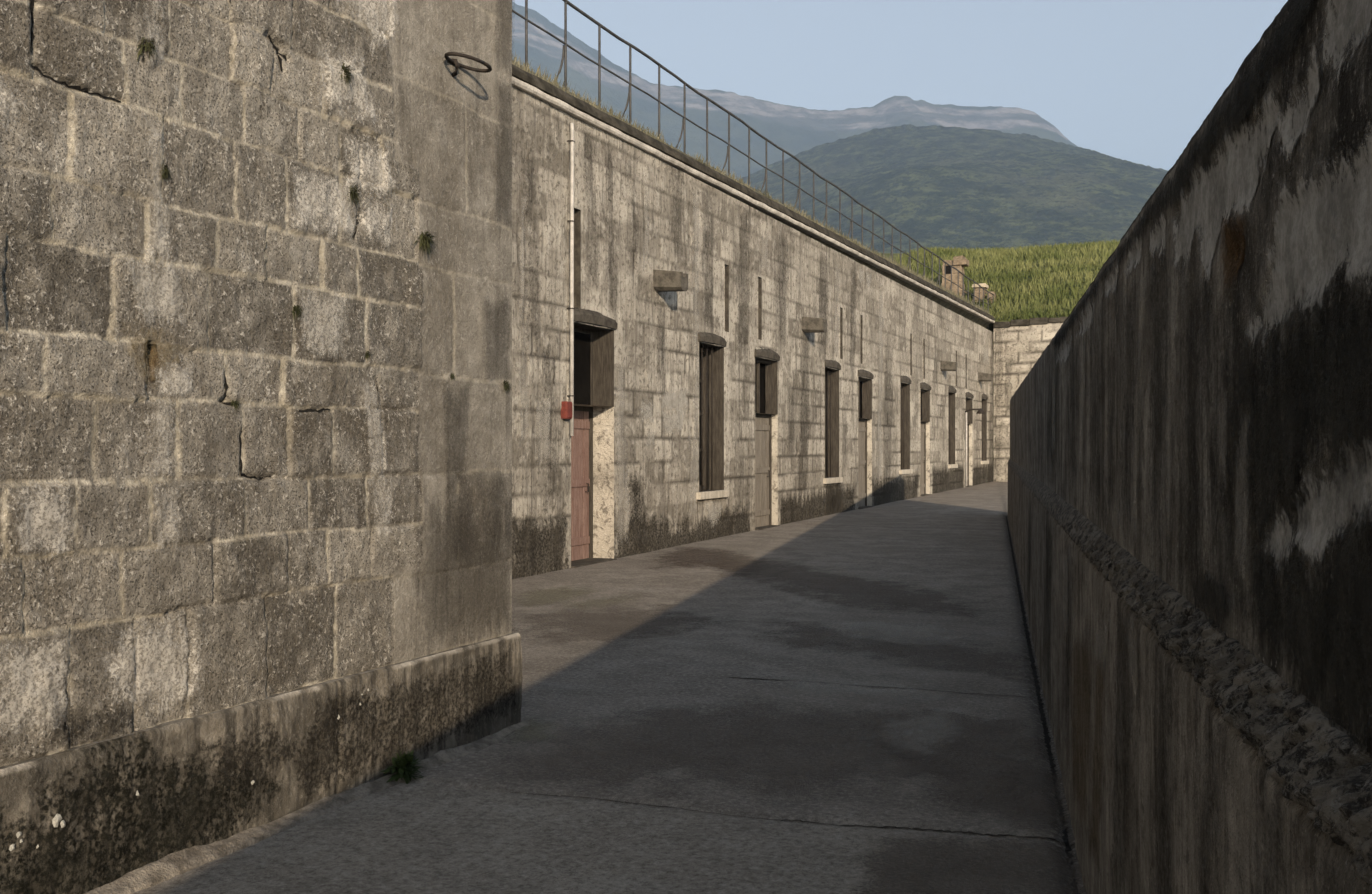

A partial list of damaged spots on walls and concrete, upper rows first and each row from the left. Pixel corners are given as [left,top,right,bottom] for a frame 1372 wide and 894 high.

crack [30,0,121,102]
water stain [1052,0,1312,351]
water stain [512,513,569,579]
water stain [614,366,976,617]
water stain [1230,278,1372,758]
water stain [0,620,201,749]
mould [198,653,515,796]